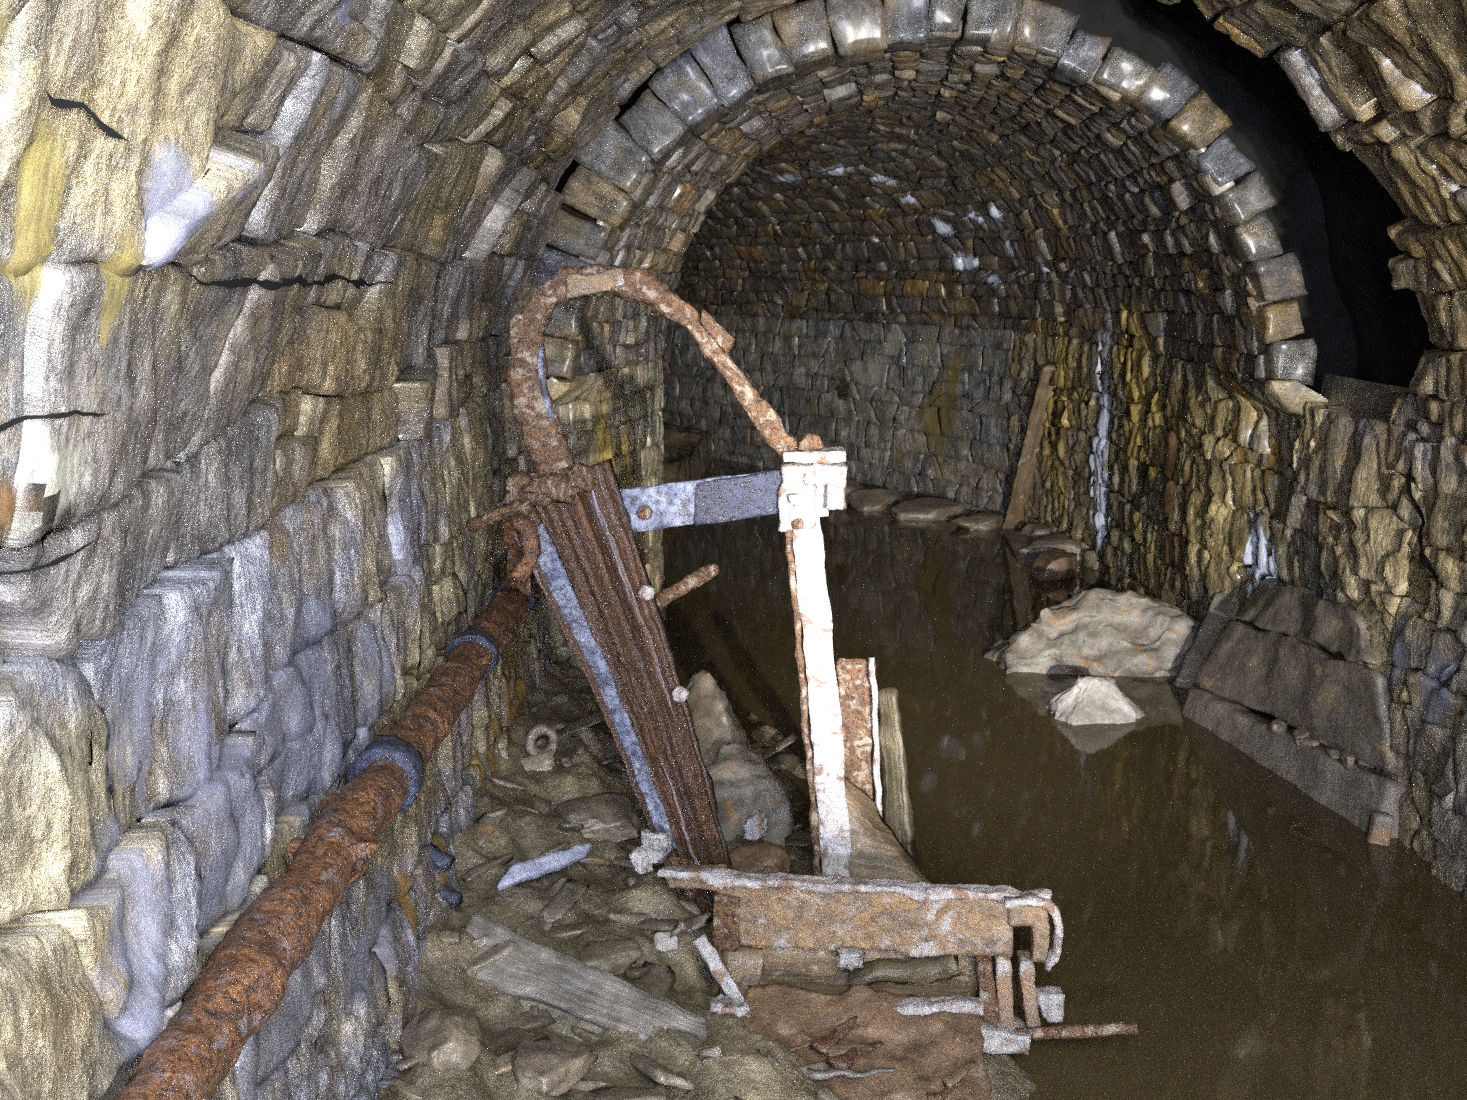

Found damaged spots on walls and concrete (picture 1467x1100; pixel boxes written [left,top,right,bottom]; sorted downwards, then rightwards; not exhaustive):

crack [0,410,107,432]
corrosion [0,484,24,530]